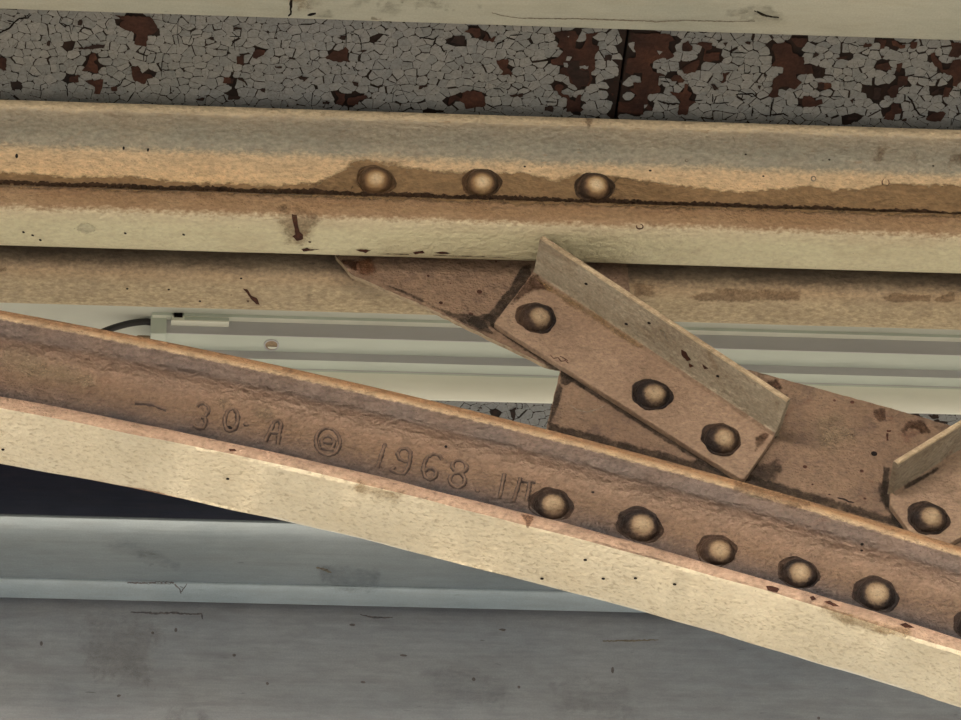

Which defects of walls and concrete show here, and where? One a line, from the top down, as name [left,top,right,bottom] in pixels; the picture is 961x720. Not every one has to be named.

peeling [69,44,117,94]
peeling [110,14,158,47]
peeling [131,66,153,84]
peeling [236,49,265,65]
peeling [325,35,381,62]
peeling [448,90,486,109]
peeling [451,28,496,52]
peeling [551,30,612,112]
peeling [617,33,728,115]
peeling [758,37,832,107]
peeling [863,39,917,121]
peeling [931,42,961,98]